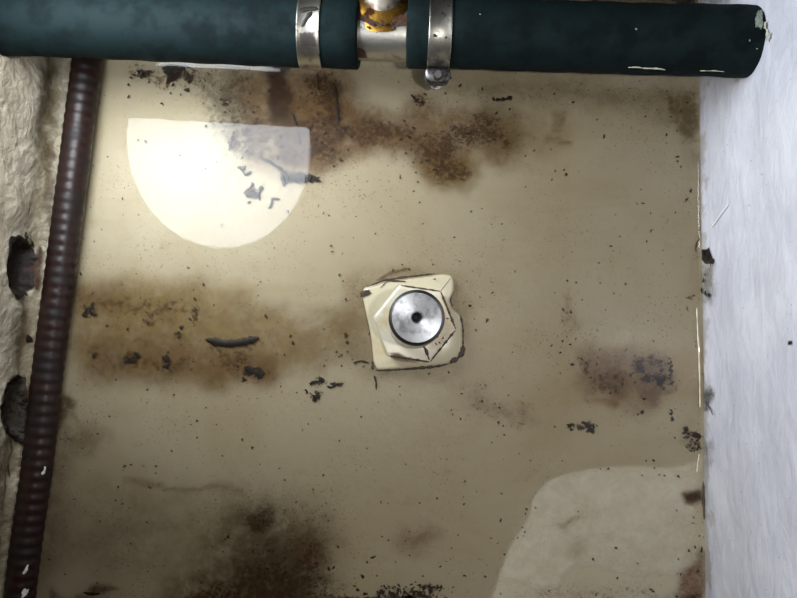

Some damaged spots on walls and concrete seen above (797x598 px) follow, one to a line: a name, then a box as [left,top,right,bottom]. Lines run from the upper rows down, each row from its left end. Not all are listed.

corrosion [237,66,518,183]
spalling [7,232,42,300]
leakage [79,283,349,379]
spalling [0,375,30,511]
leakage [192,504,446,598]